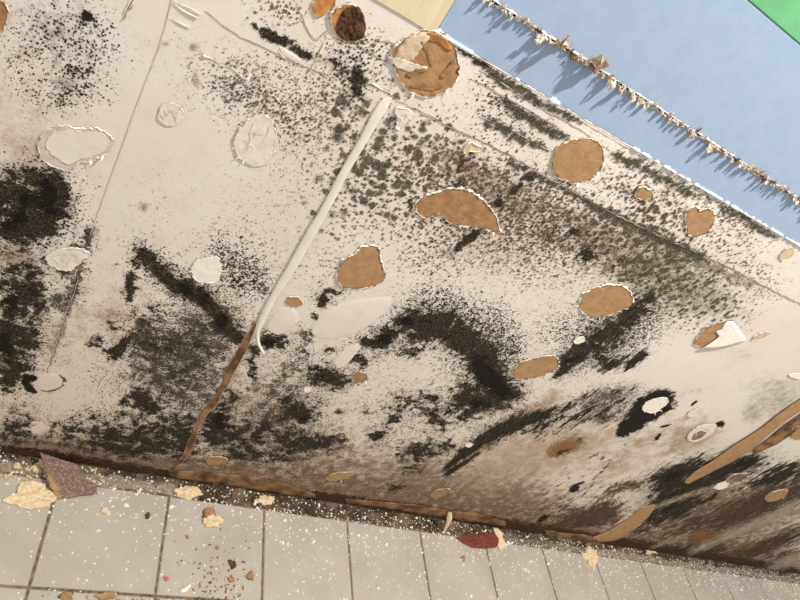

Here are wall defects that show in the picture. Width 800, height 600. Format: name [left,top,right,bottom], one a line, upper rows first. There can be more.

peeling [312,0,369,42]
damp [1,0,127,120]
peeling [387,29,460,98]
damp [169,1,410,218]
peeling [550,138,606,187]
peeling [414,186,503,236]
peeling [336,244,388,291]
peeling [577,283,635,320]
damp [0,107,800,573]
peeling [694,319,771,349]
peeling [512,355,560,381]
peeling [642,397,669,415]